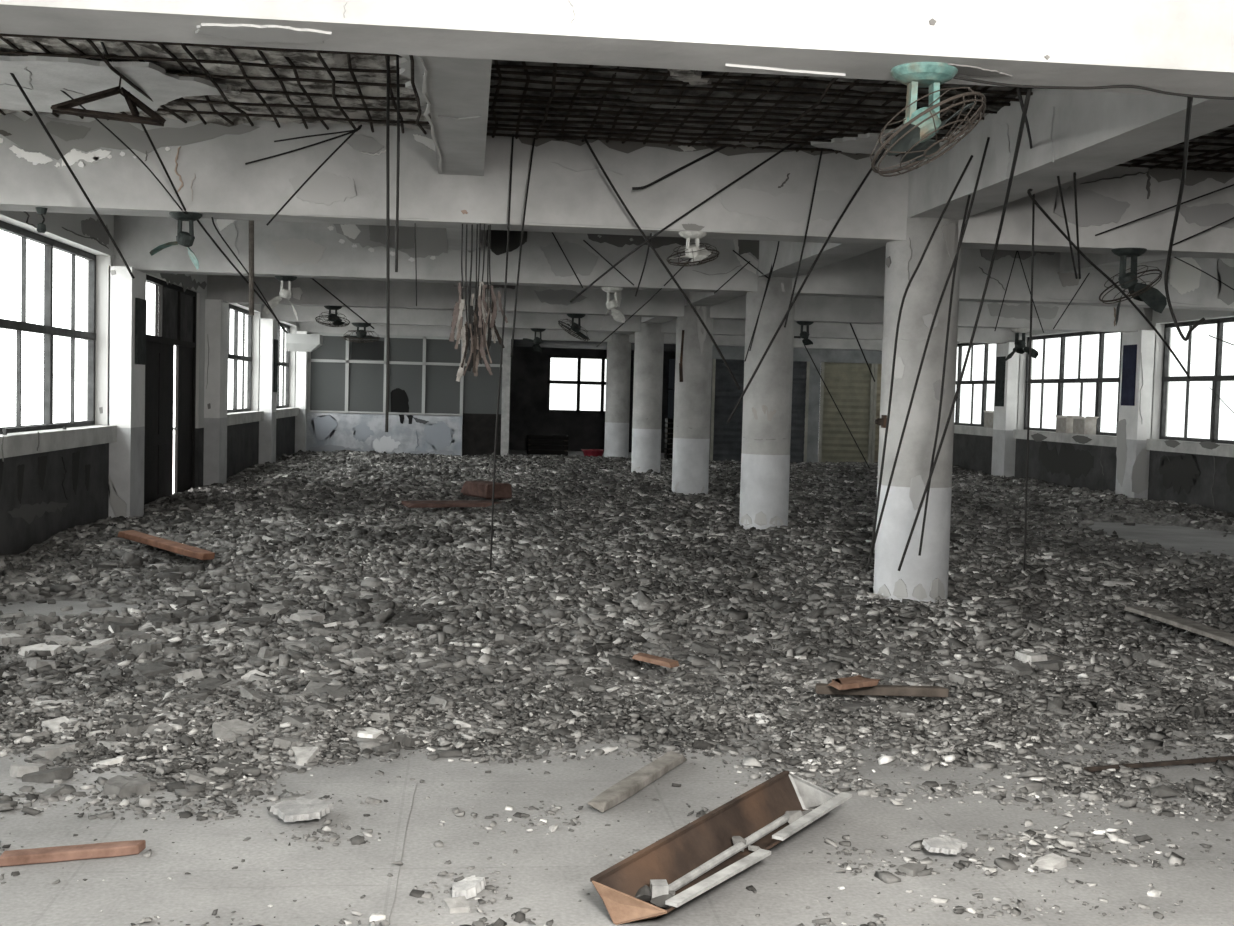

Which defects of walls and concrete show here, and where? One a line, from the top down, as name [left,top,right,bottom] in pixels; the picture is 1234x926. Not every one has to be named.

spalling [0,36,436,168]
spalling [487,59,1034,160]
spalling [1127,127,1234,170]